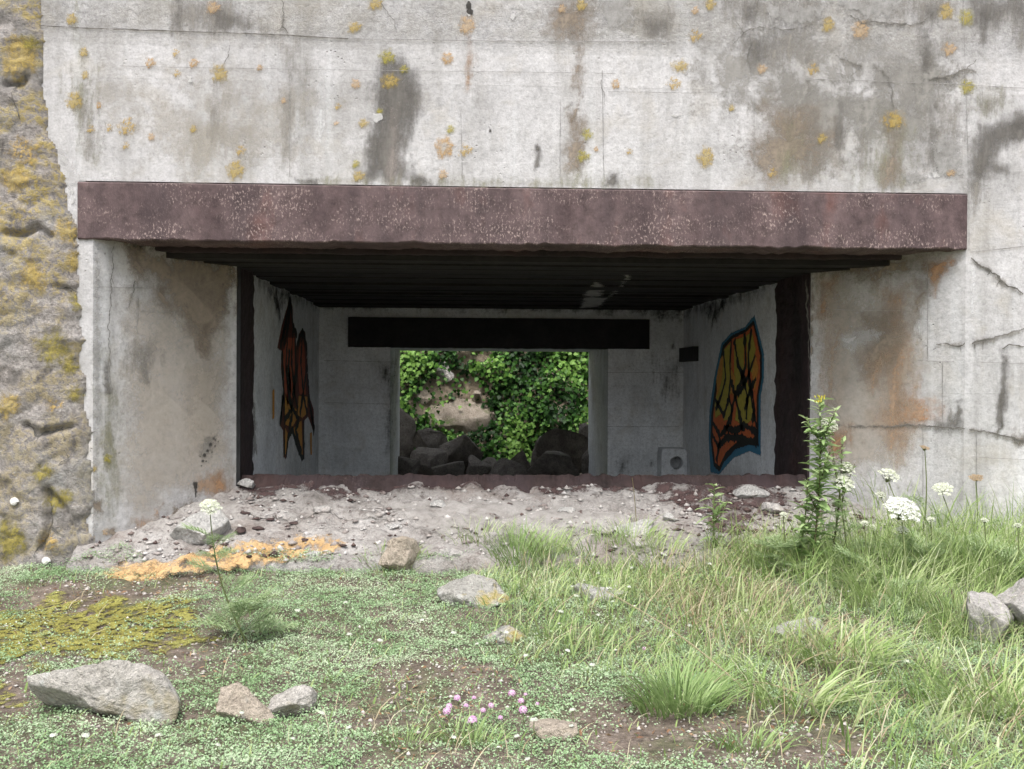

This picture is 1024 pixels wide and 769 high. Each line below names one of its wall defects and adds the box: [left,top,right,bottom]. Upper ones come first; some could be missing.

leakage [366,61,426,185]
leakage [566,106,587,187]
leakage [716,0,973,187]
leakage [968,112,1024,205]
crack [107,246,139,394]
spalling [579,275,631,308]
corrosion [828,258,954,465]
crack [971,258,1023,294]